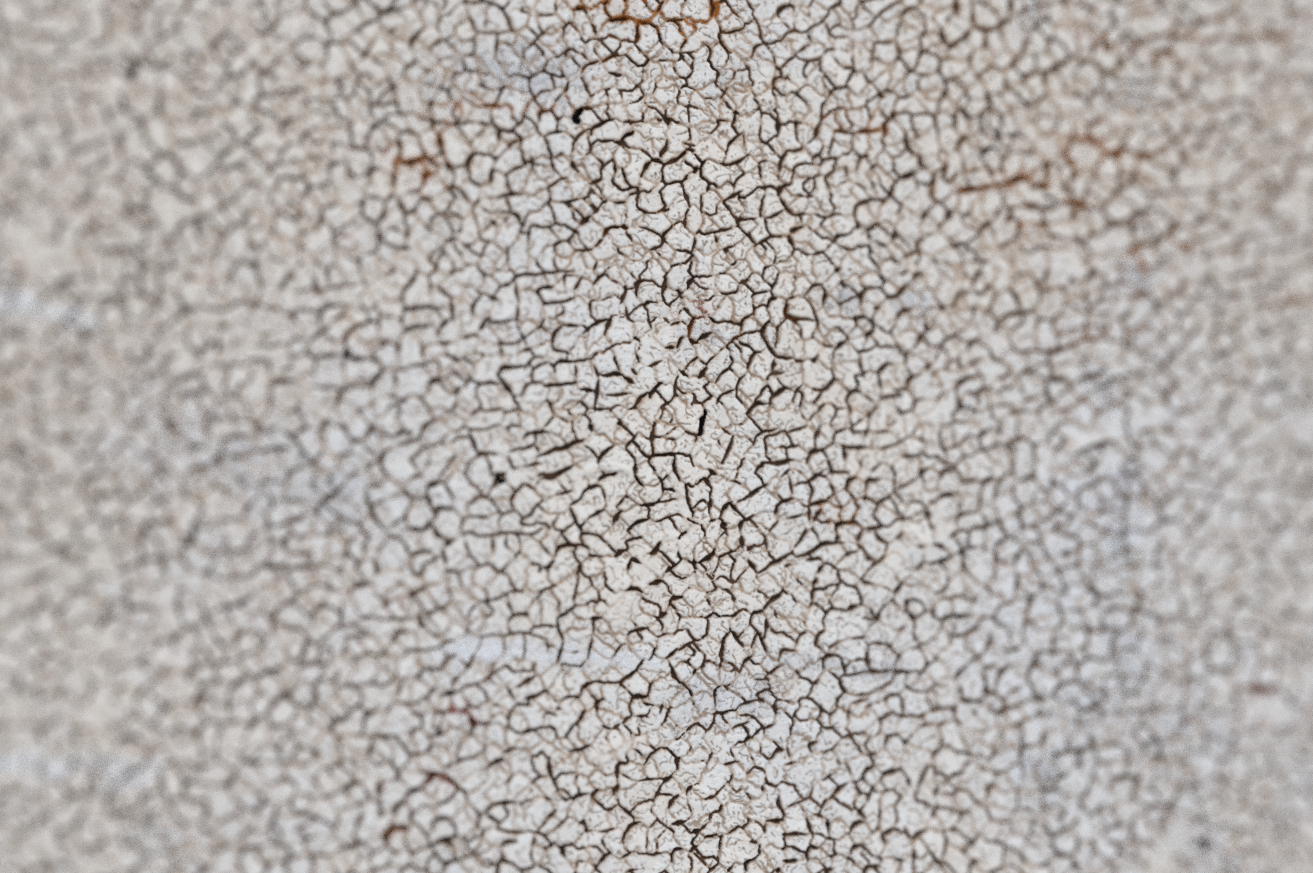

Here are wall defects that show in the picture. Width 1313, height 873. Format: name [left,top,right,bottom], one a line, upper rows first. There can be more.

rust [572,0,728,43]
rust [1056,122,1154,176]
crack [0,0,463,873]
crack [718,428,734,464]
crack [626,579,683,638]
crack [613,623,650,657]
crack [543,647,673,739]
crack [669,664,694,705]
crack [760,741,796,765]
crack [390,715,614,873]
crack [727,839,761,872]
crack [846,844,882,873]